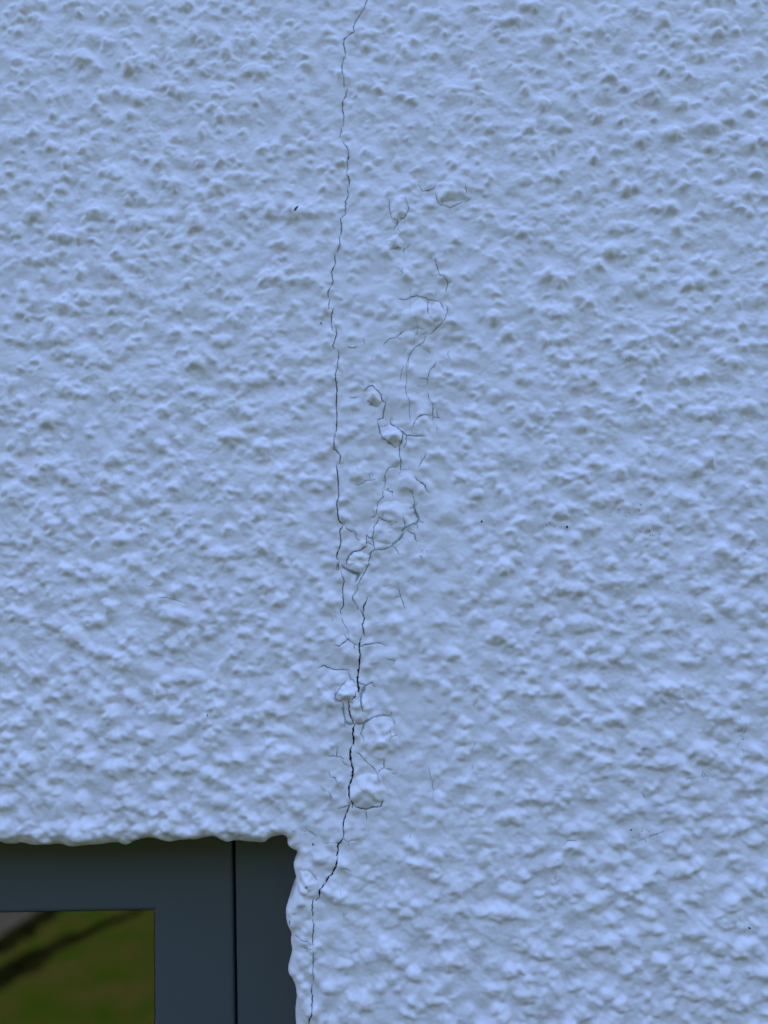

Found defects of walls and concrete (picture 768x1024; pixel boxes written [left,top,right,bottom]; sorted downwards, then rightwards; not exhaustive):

crack [293,0,471,1023]